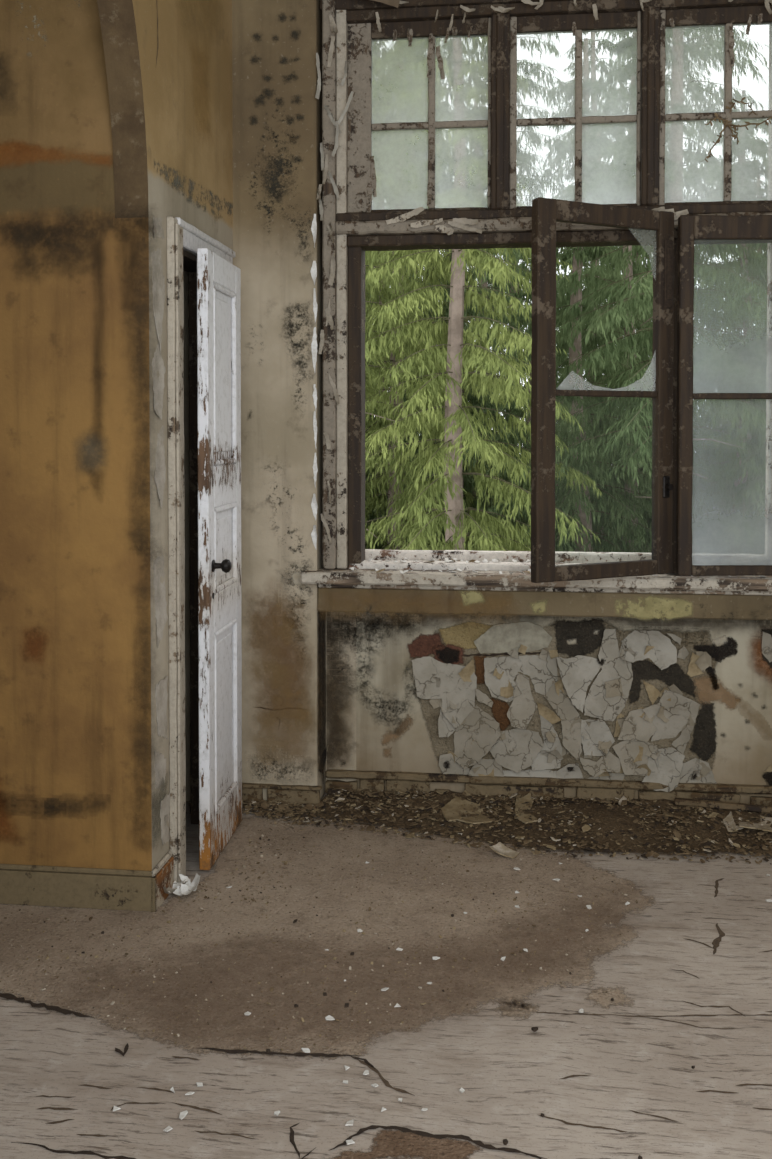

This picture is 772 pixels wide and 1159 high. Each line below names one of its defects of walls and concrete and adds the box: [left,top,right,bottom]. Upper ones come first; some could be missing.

peeling [491,0,544,13]
damp [250,77,303,232]
peeling [386,125,482,235]
peeling [310,13,354,549]
damp [285,305,311,403]
damp [256,527,473,787]
peeling [408,596,741,792]
damp [617,607,709,628]
crack [13,1084,255,1159]
crack [289,1123,315,1159]
crack [351,1056,415,1096]
spalling [330,1125,547,1159]